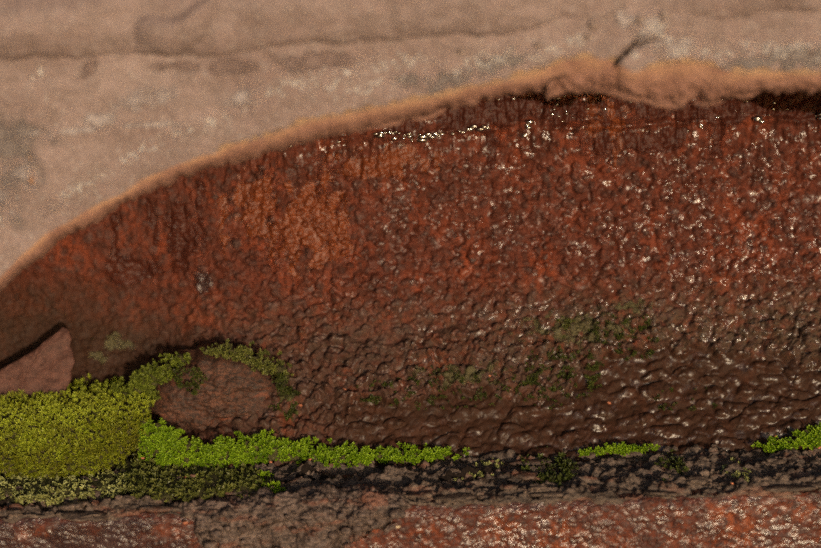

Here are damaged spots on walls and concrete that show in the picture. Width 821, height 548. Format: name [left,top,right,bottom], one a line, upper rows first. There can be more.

crack [601,37,656,77]
corrosion [585,93,634,168]
corrosion [218,143,443,281]
corrosion [0,327,75,403]